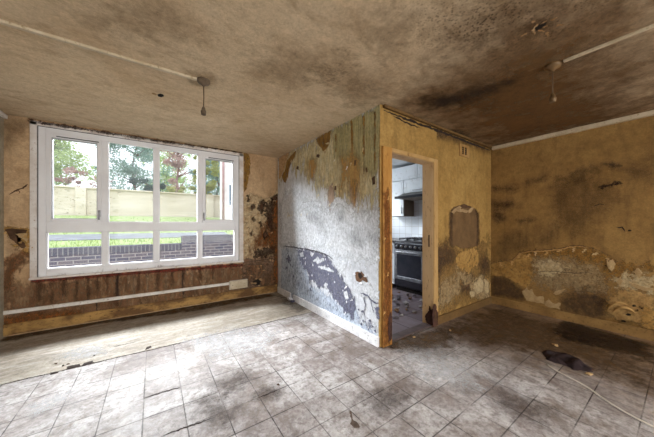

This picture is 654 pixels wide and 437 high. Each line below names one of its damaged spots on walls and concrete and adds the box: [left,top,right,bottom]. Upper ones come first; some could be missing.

leakage [403,0,654,147]
crack [384,110,489,150]
flaking render [3,226,33,254]
leakage [1,249,273,341]
peeling [279,104,392,346]
flaking render [449,204,616,309]